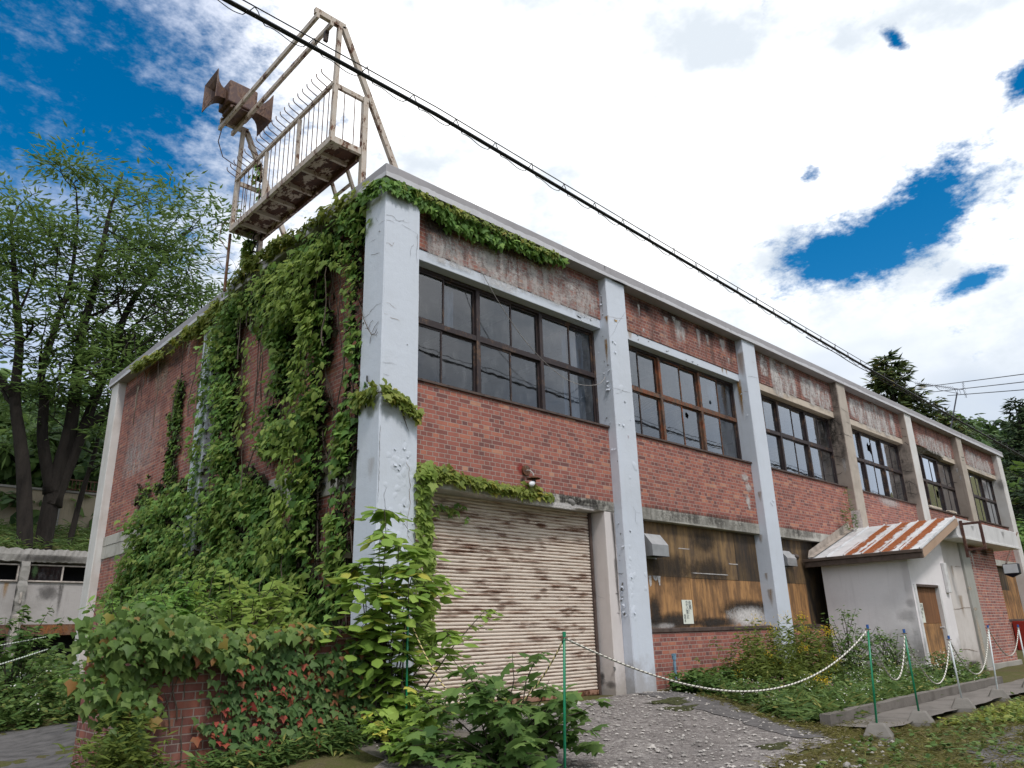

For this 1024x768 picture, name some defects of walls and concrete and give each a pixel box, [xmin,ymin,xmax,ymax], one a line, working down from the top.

damp [424,218,594,315]
damp [760,355,896,467]
corrosion [846,518,945,555]